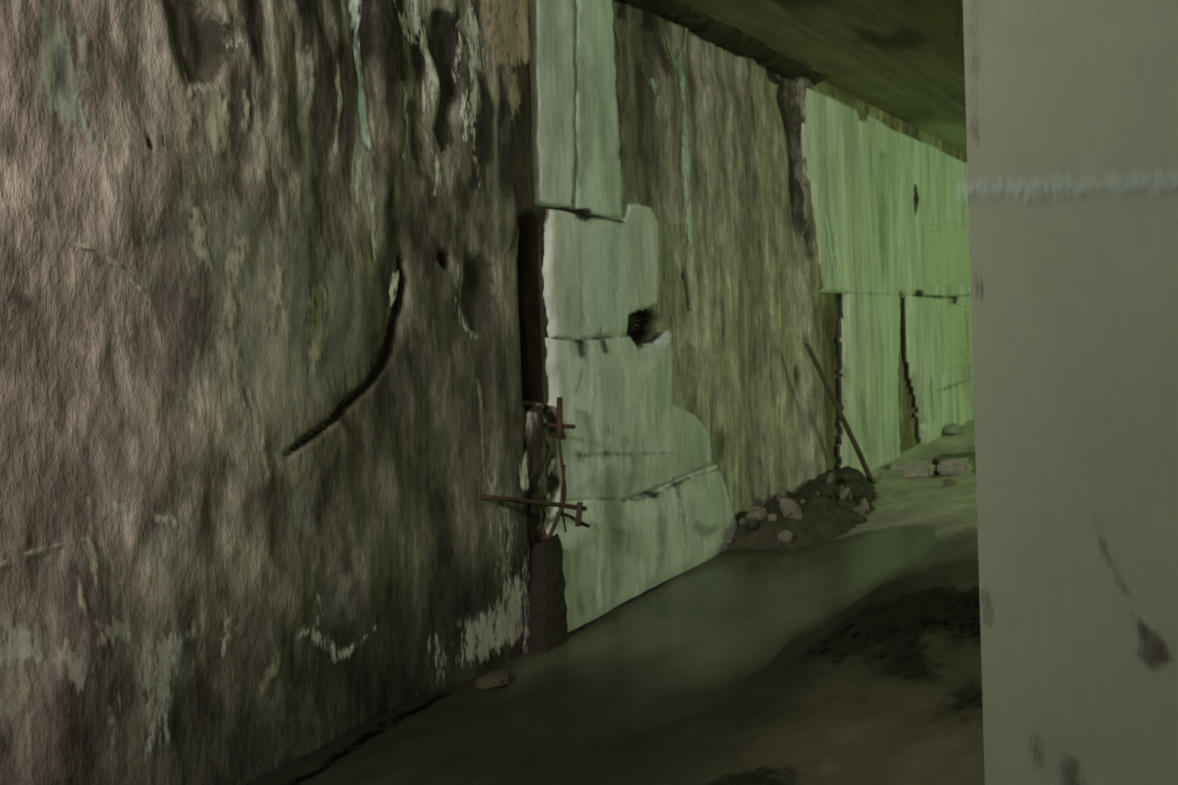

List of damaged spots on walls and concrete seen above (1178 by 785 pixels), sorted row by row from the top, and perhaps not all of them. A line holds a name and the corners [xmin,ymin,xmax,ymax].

damp [664,30,695,246]
spalling [765,66,814,256]
crack [283,217,406,456]